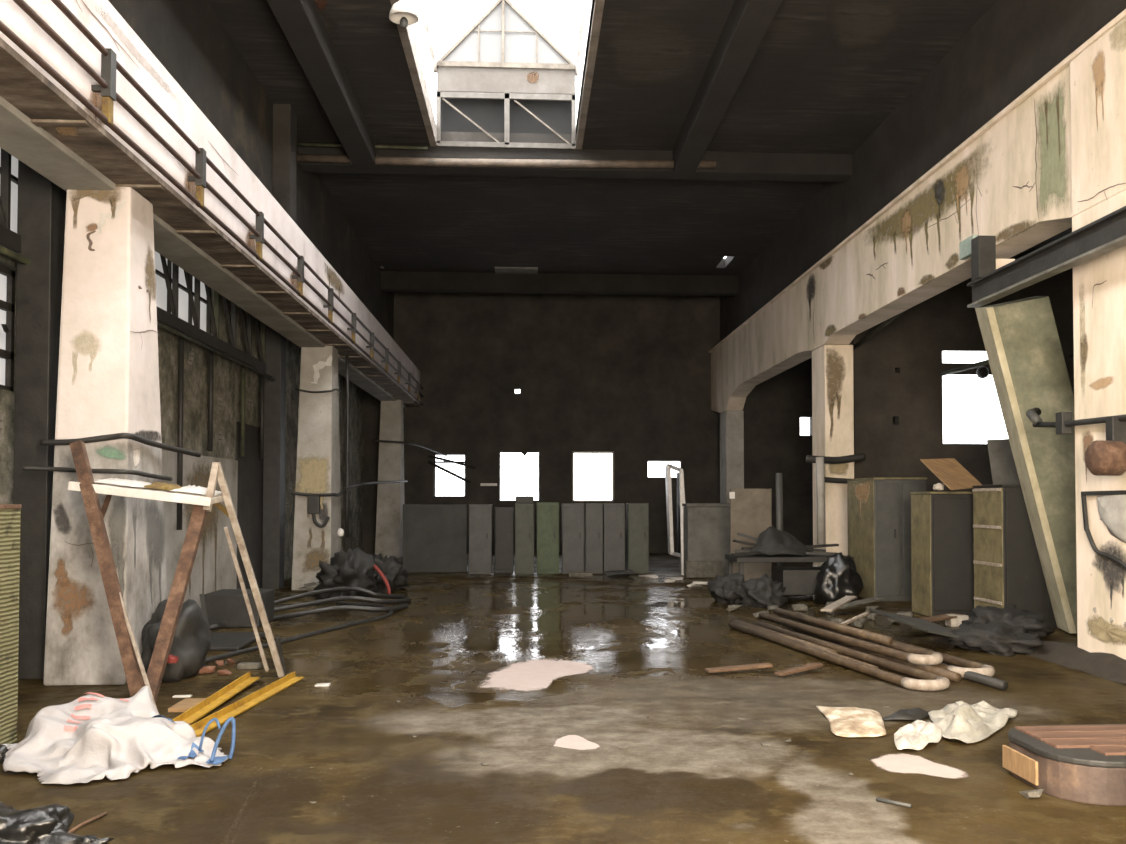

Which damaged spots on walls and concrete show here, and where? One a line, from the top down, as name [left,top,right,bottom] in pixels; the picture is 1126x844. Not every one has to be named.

corrosion [1093,53,1104,126]
leakage [1045,97,1060,155]
leakage [807,257,832,319]
corrosion [946,253,958,269]
leakage [826,350,844,437]
corrosion [54,560,93,634]
leakage [1095,545,1126,607]